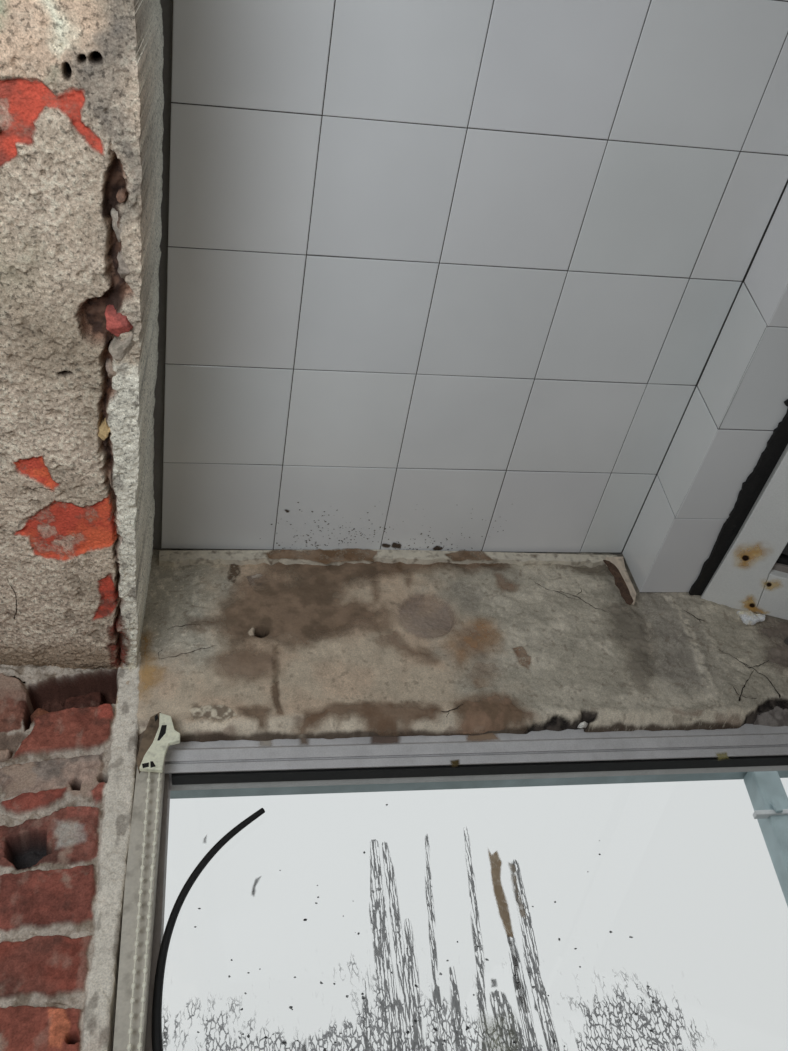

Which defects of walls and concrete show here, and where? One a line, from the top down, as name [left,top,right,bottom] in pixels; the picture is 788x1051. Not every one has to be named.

spalling [0,79,103,166]
crack [81,158,127,614]
spalling [14,457,117,560]
spalling [93,574,130,667]
water stain [191,502,515,679]
rust [739,547,762,566]
rust [744,598,763,613]
water stain [299,702,438,744]
crack [718,649,781,701]
spalling [742,699,788,727]
water stain [362,834,467,1051]
water stain [464,827,560,1051]